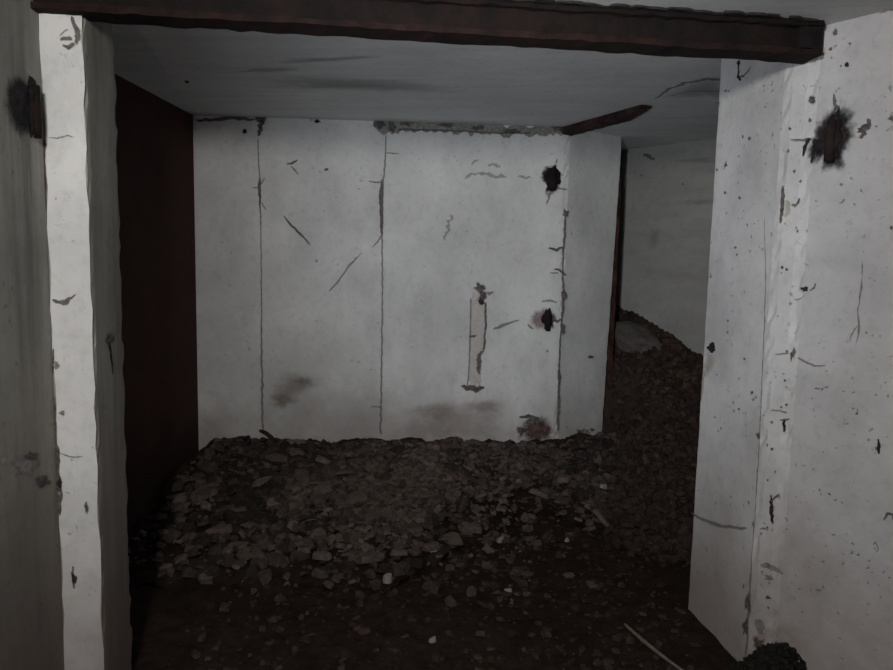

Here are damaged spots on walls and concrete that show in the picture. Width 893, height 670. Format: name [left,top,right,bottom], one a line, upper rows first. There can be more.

crack [197,115,255,123]
spalling [374,121,563,137]
spalling [829,115,877,150]
crack [253,144,310,428]
crack [329,137,399,433]
spalling [475,283,487,305]
crack [547,188,569,430]